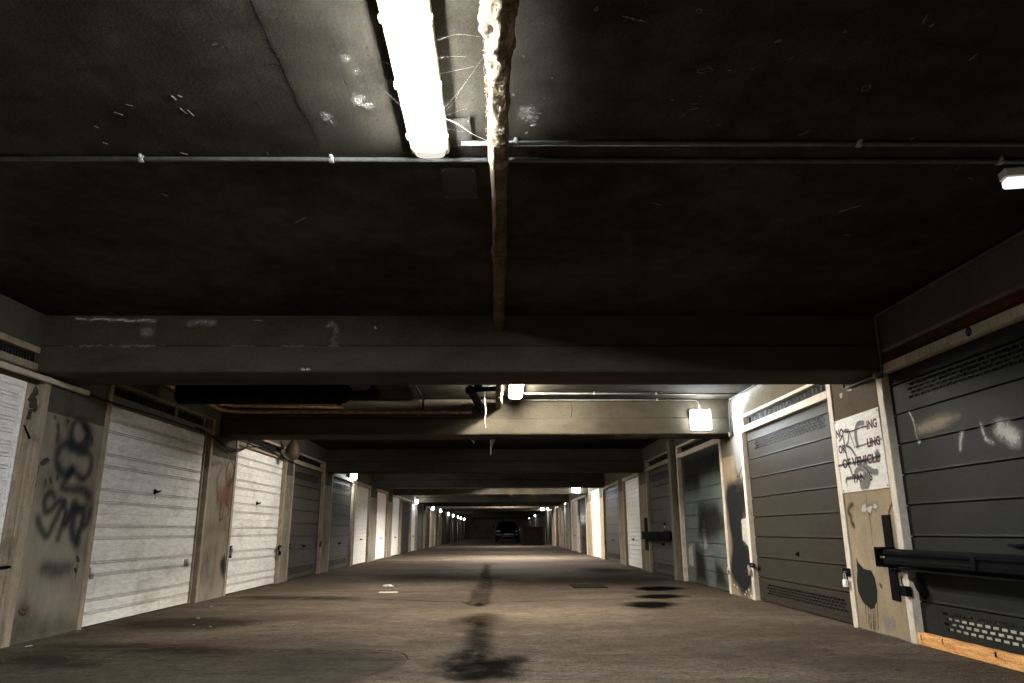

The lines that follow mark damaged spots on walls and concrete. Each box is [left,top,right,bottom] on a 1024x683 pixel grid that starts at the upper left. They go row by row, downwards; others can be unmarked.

crack [249,0,319,146]